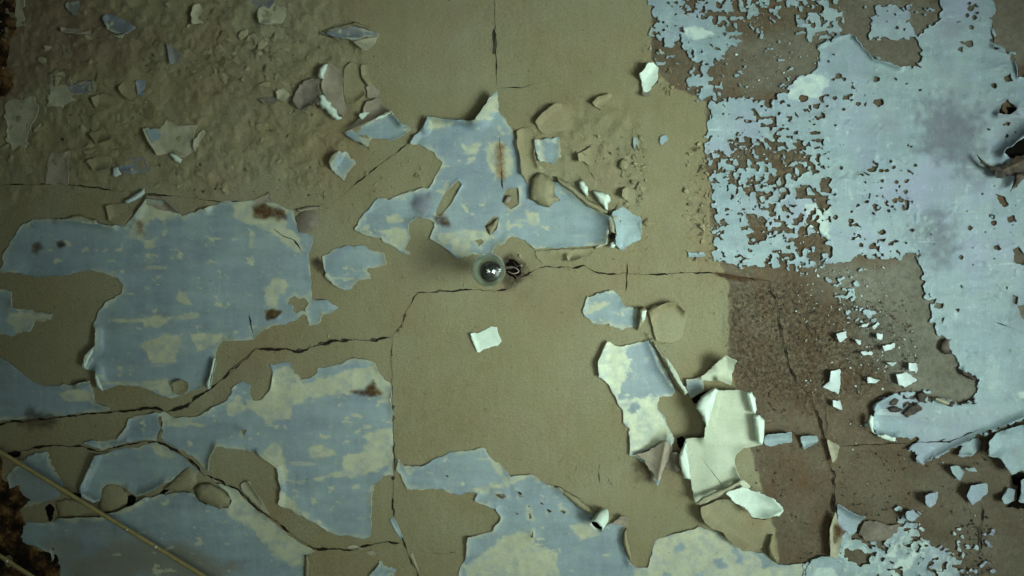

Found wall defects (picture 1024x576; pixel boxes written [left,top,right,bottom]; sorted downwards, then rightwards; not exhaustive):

flaking render [0,0,100,185]
peeling [112,119,206,177]
peeling [0,185,338,420]
peeling [190,3,209,24]
corrosion [253,203,286,219]
peeling [319,21,380,57]
corrosion [354,382,381,396]
crack [0,265,836,576]
peeling [259,64,651,290]
peeling [0,289,996,576]
crack [492,1,532,89]
peeling [635,0,1024,475]